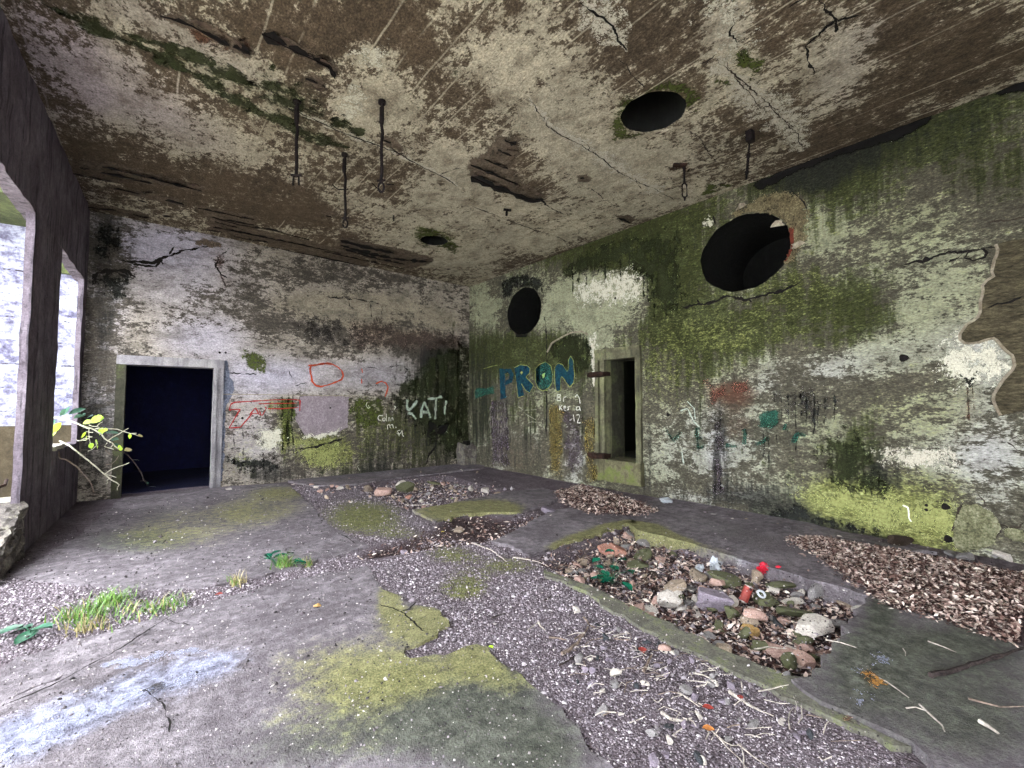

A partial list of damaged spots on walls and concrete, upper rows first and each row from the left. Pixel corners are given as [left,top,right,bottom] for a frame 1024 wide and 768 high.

spalling [155,9,391,120]
crack [577,0,644,87]
crack [787,0,858,73]
spalling [467,135,545,203]
crack [92,246,227,285]
spalling [68,160,434,269]
leakage [562,226,688,321]
crack [903,217,1024,265]
peeling [929,239,1024,416]
leakage [710,411,725,494]
leakage [762,387,895,500]
leakage [768,494,881,537]